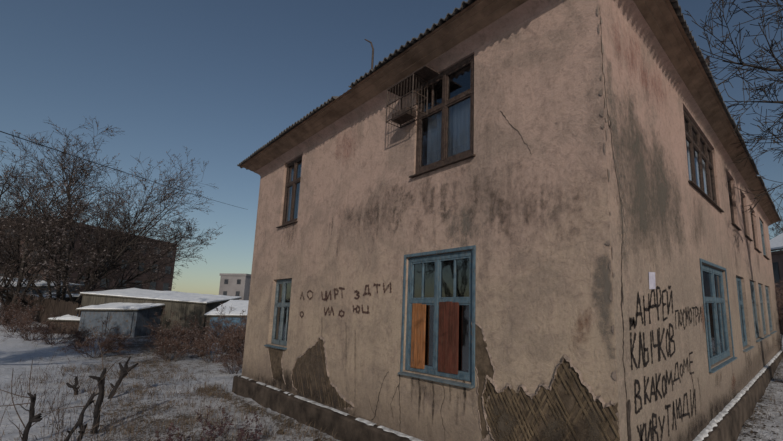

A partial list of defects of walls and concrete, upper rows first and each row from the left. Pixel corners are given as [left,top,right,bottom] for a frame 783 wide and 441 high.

flaking render [471,321,632,441]